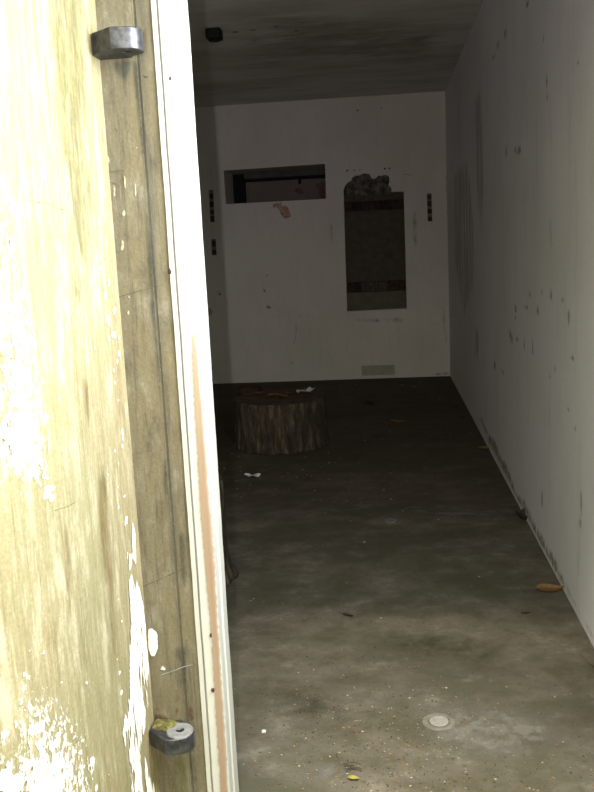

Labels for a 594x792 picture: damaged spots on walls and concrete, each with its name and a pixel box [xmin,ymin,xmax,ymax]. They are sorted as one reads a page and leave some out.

peeling [0,200,55,502]
peeling [0,673,98,792]
peeling [119,516,158,792]